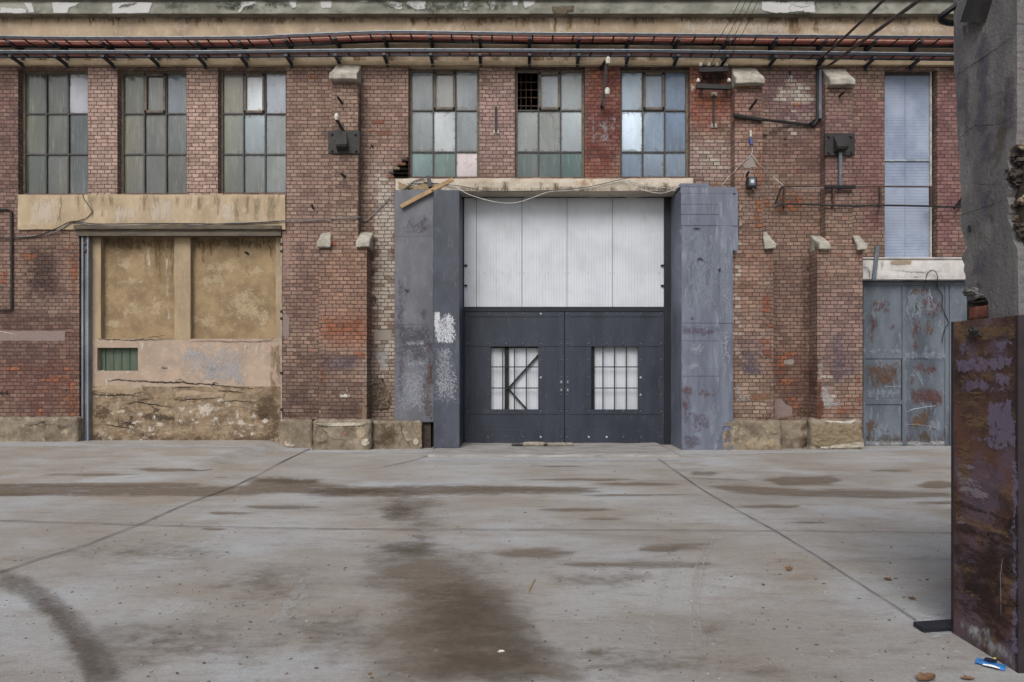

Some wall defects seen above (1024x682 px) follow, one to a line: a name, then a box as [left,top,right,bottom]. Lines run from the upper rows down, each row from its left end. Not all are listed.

peeling [0,2,34,14]
peeling [52,2,79,13]
peeling [112,2,152,14]
peeling [387,1,426,10]
spalling [387,158,442,190]
spalling [1005,142,1024,237]
crack [93,379,256,430]
peeling [100,397,268,440]
corrosion [909,364,942,439]
corrosion [954,500,1021,648]